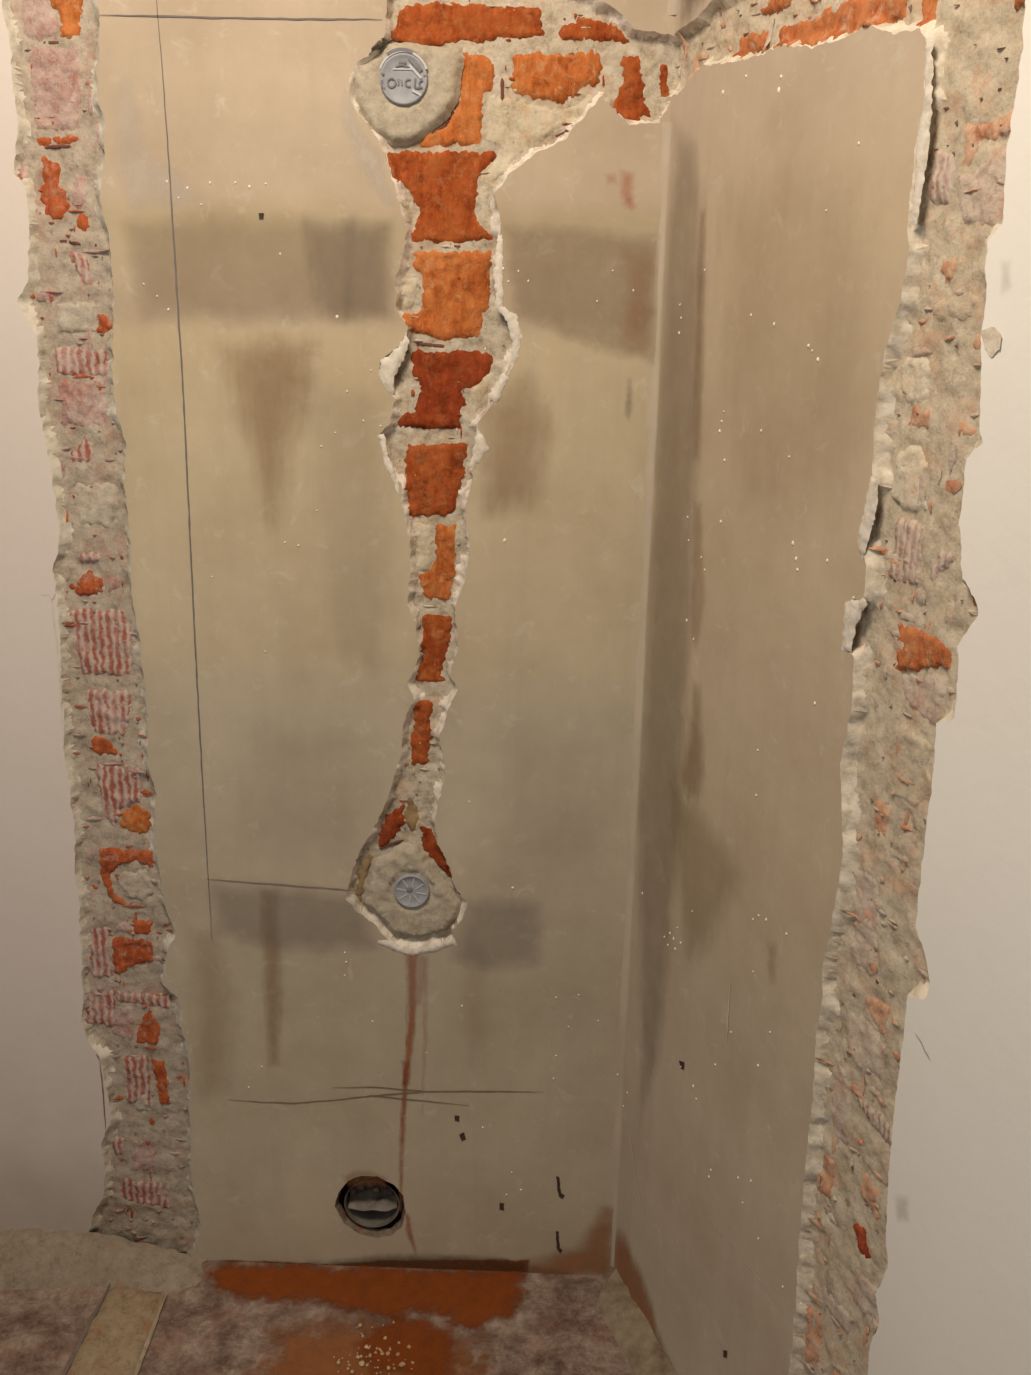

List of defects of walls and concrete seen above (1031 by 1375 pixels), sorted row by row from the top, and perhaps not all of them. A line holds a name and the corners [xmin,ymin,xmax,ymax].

spalling [2,0,201,1256]
spalling [345,0,1026,1375]